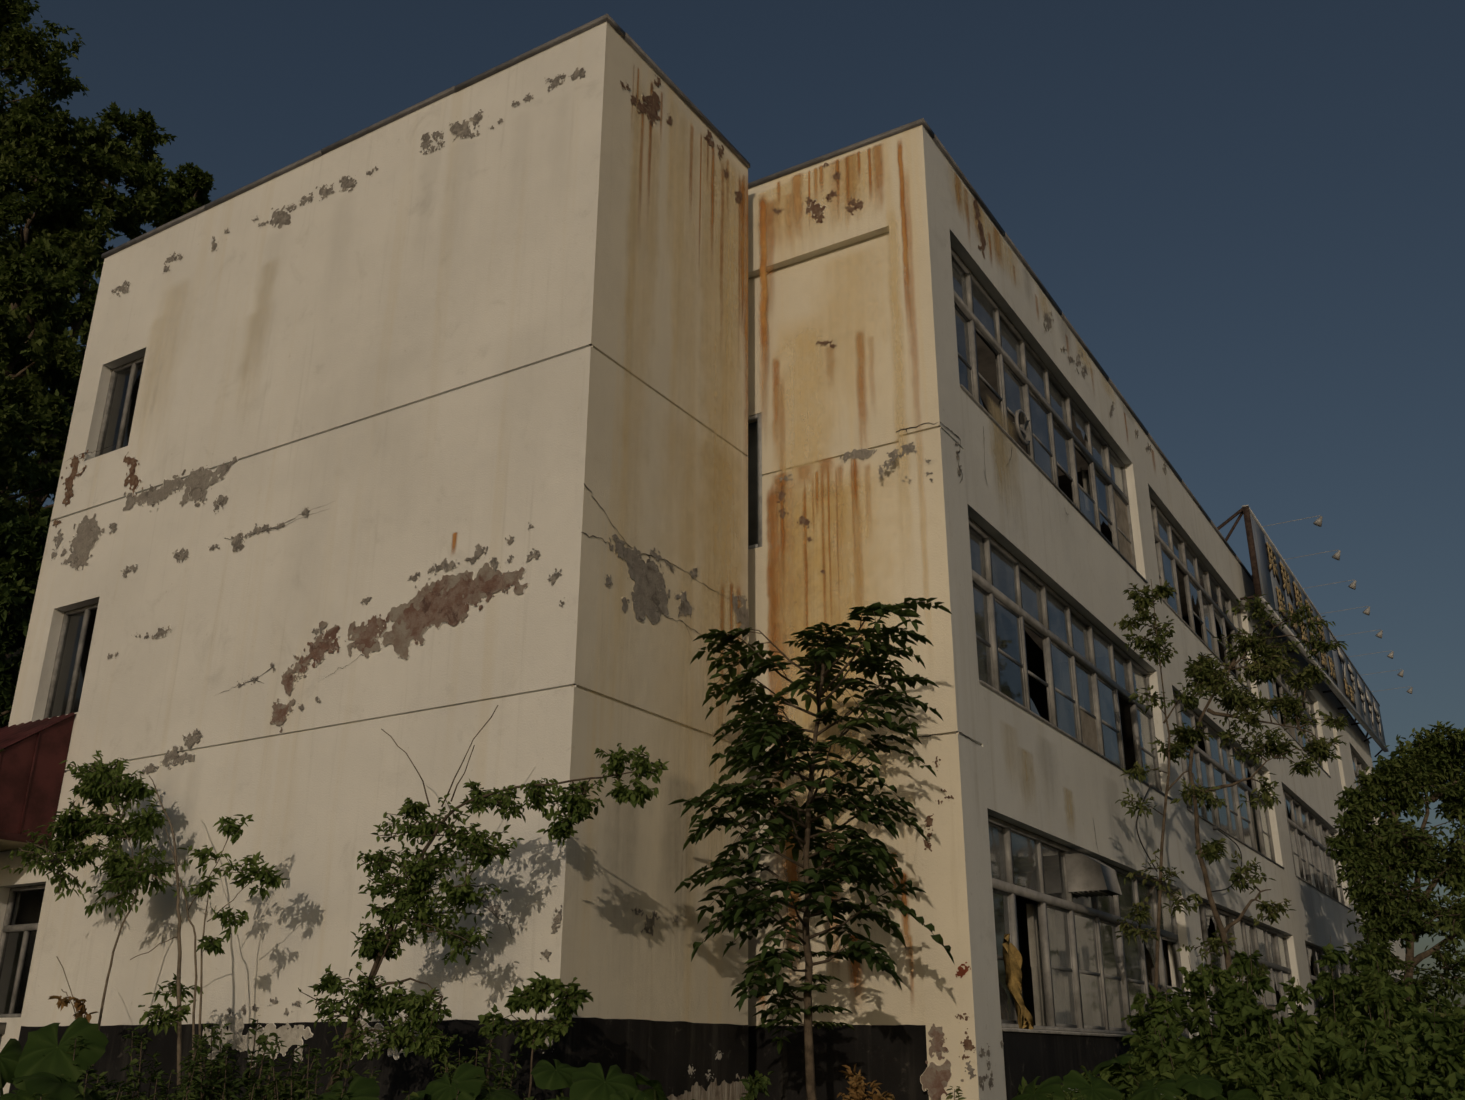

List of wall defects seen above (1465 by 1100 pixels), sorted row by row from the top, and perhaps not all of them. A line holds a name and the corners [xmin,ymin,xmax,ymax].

peeling [419,67,586,154]
peeling [251,166,378,229]
corrosion [699,138,714,239]
flaking render [805,163,863,224]
corrosion [740,144,909,424]
peeling [840,439,933,484]
flaking render [51,450,238,571]
peeling [209,522,285,552]
peeling [237,522,540,733]
flaking render [605,534,698,624]
corrosion [769,471,836,742]
flaking render [920,1013,1004,1100]